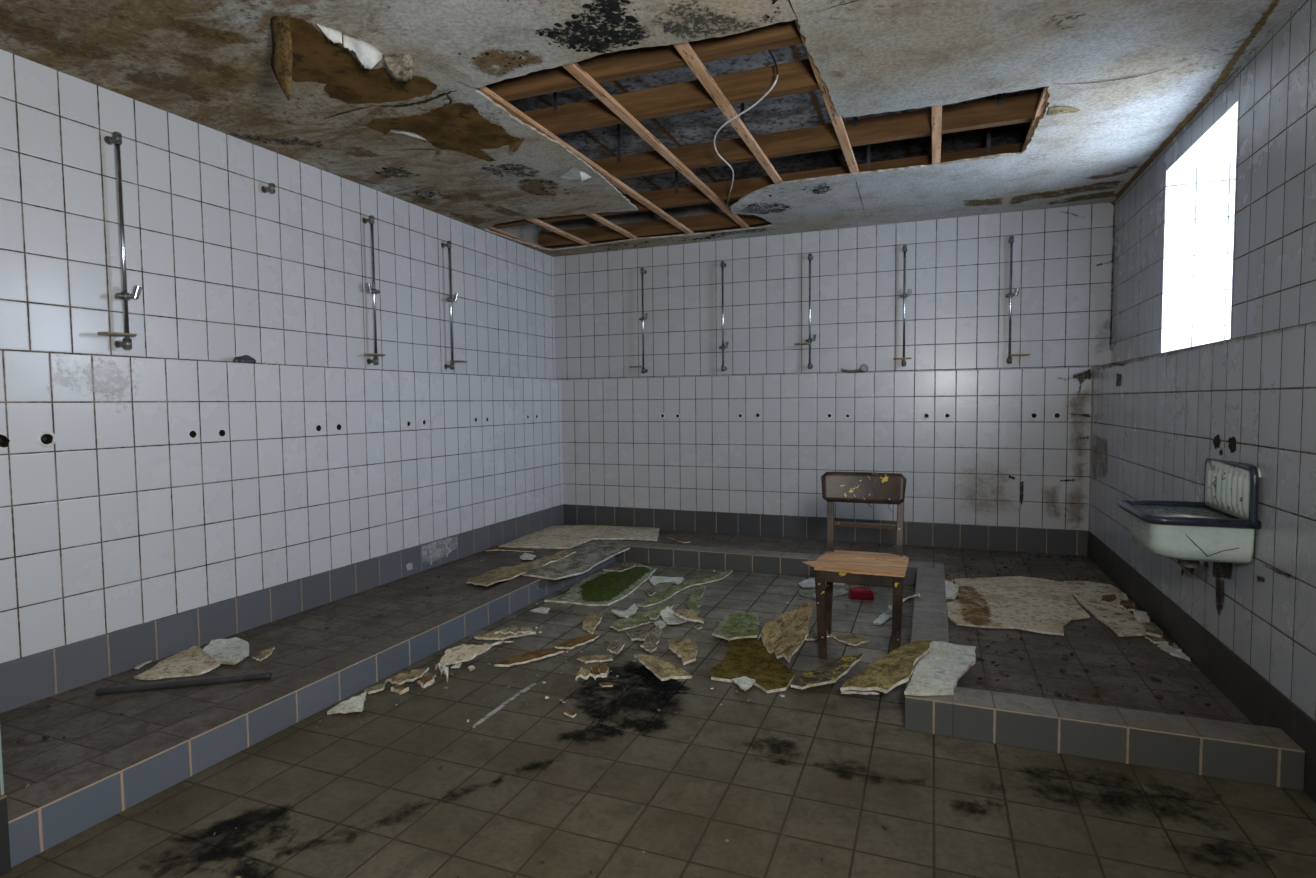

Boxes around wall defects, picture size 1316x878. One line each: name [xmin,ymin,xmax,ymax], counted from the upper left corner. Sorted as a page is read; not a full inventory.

water stain [0,11,113,60]
water stain [169,21,252,44]
water stain [535,0,780,53]
water stain [127,53,237,103]
peeling [270,15,525,162]
water stain [458,49,542,76]
water stain [229,129,322,148]
peeling [560,167,591,183]